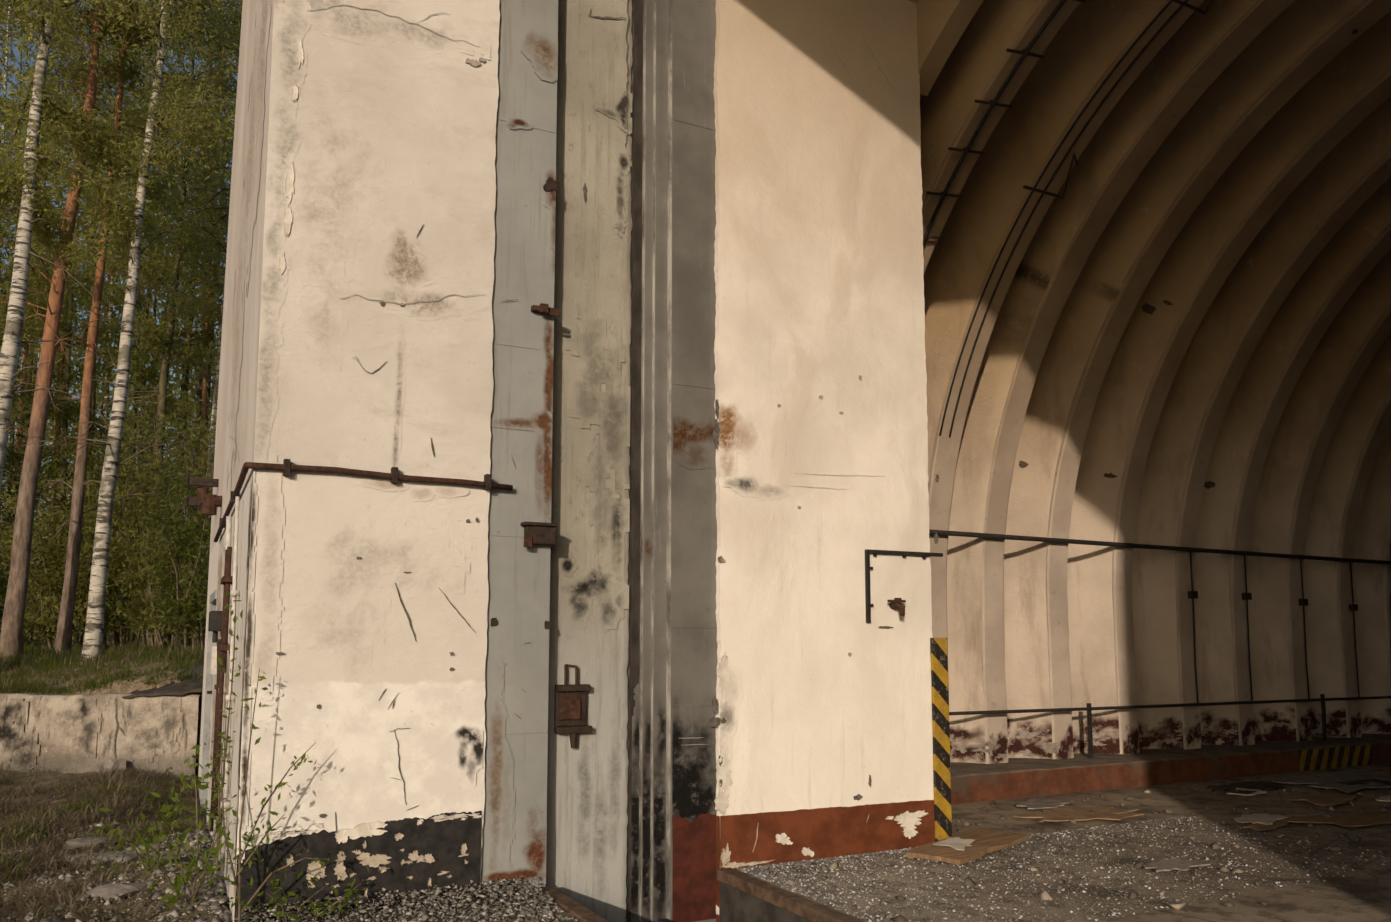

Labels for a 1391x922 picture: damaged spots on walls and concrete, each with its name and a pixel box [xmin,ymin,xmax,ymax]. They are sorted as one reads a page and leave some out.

crack [308,4,472,44]
leakage [306,0,491,60]
flaking render [208,0,468,907]
leakage [373,222,462,471]
crack [340,294,519,305]
corrosion [490,306,554,523]
leakage [558,300,630,632]
corrosion [673,399,760,481]
peeling [417,813,483,825]
corrosion [481,659,547,891]
leakage [572,666,743,922]
peeling [885,810,928,839]